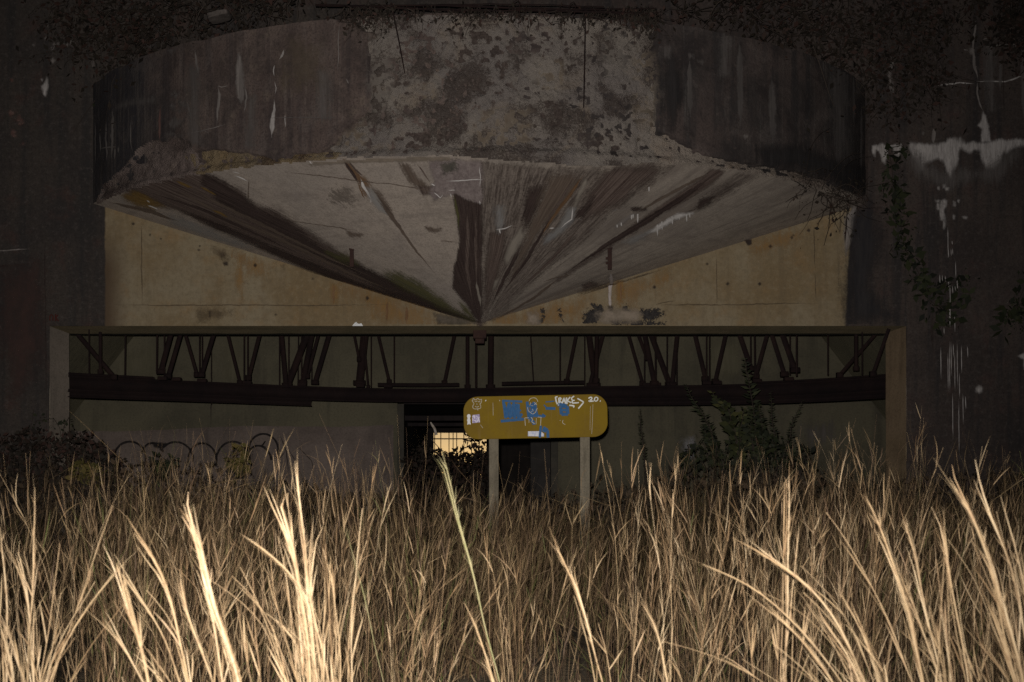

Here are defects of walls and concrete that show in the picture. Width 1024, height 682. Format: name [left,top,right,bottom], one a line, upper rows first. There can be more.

damp [216,54,254,149]
efflorescence [270,50,286,138]
spalling [96,2,867,206]
crack [946,25,1021,110]
efflorescence [940,342,968,429]